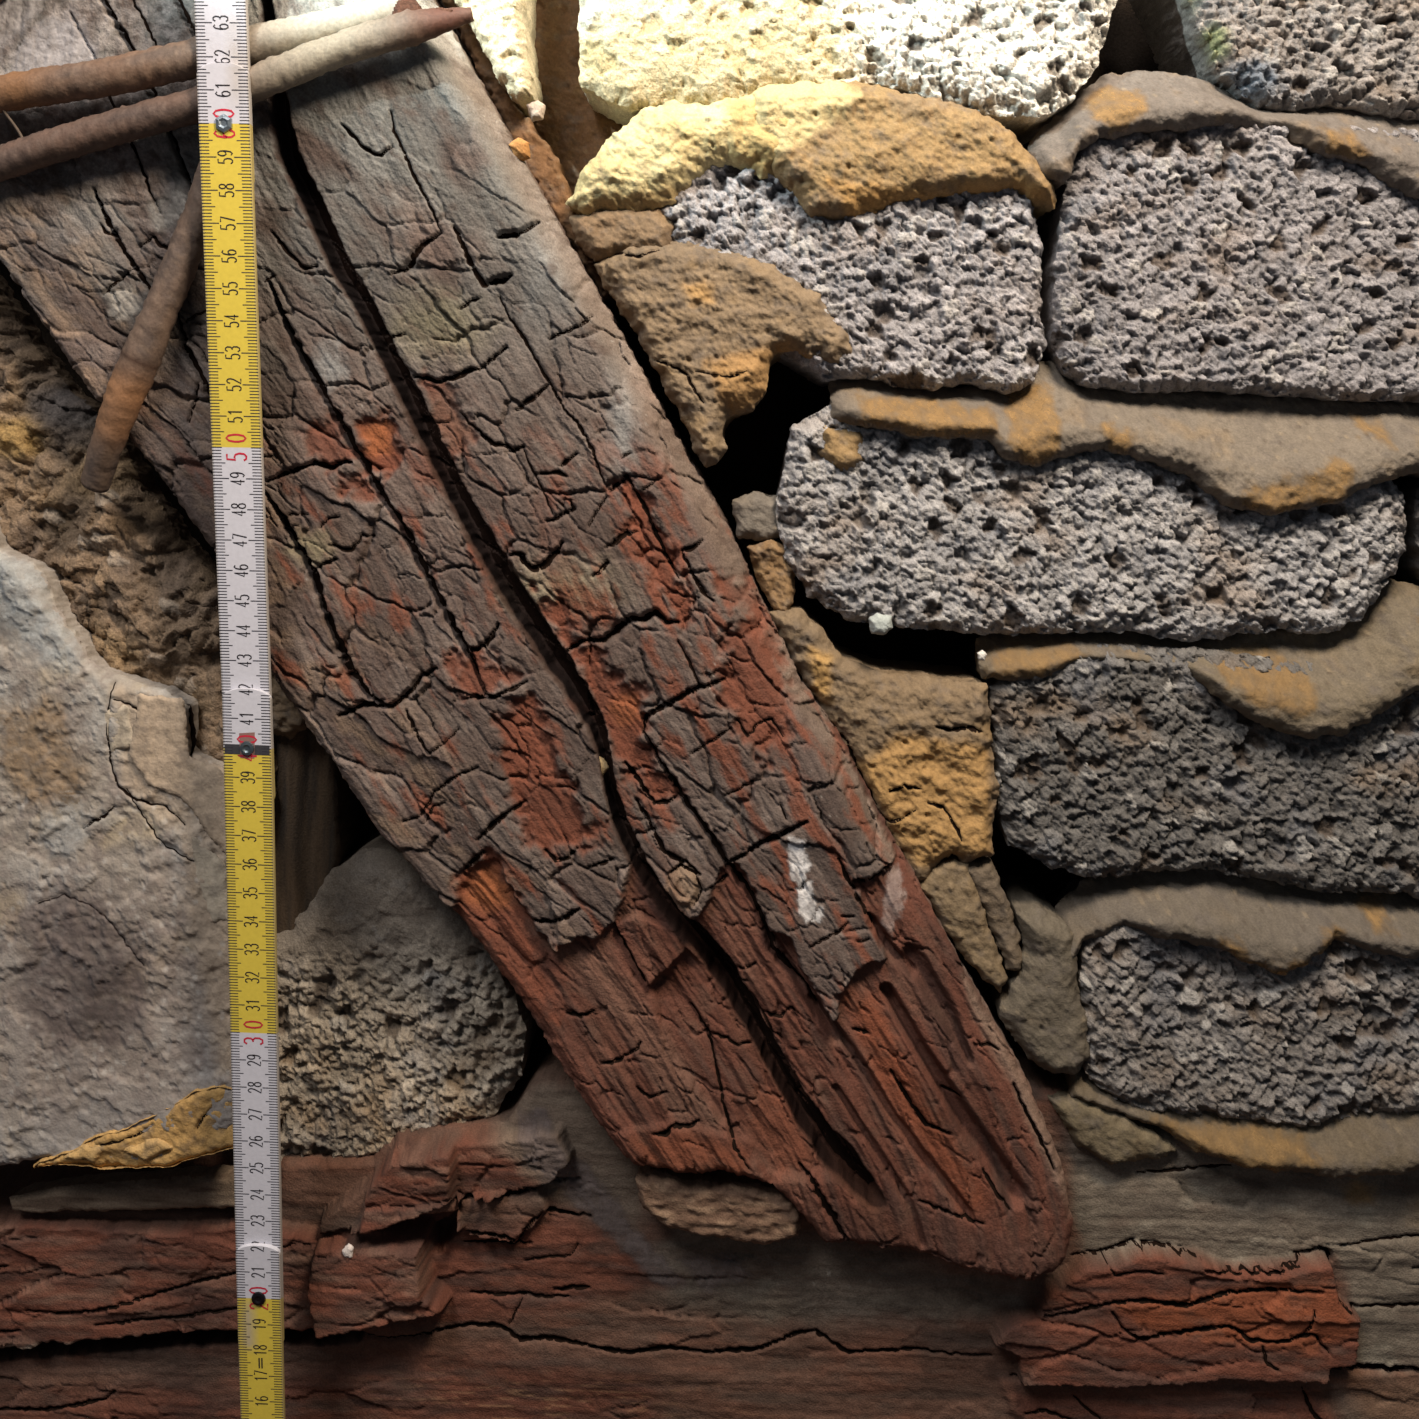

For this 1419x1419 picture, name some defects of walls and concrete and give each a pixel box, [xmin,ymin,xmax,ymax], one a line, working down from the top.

crack [83,682,195,862]
crack [188,704,197,755]
crack [368,1176,989,1355]